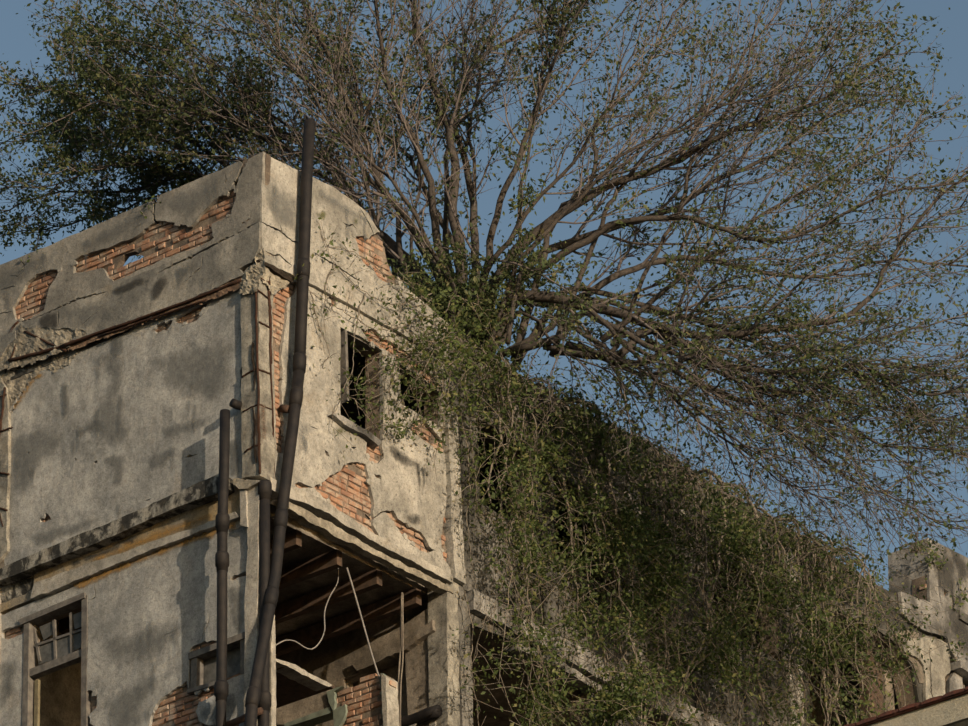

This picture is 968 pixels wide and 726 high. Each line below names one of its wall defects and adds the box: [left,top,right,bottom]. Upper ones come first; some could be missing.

spalling [352,234,394,283]
spalling [0,189,294,474]
spalling [291,446,381,534]
water stain [939,558,968,607]
spalling [148,687,214,726]